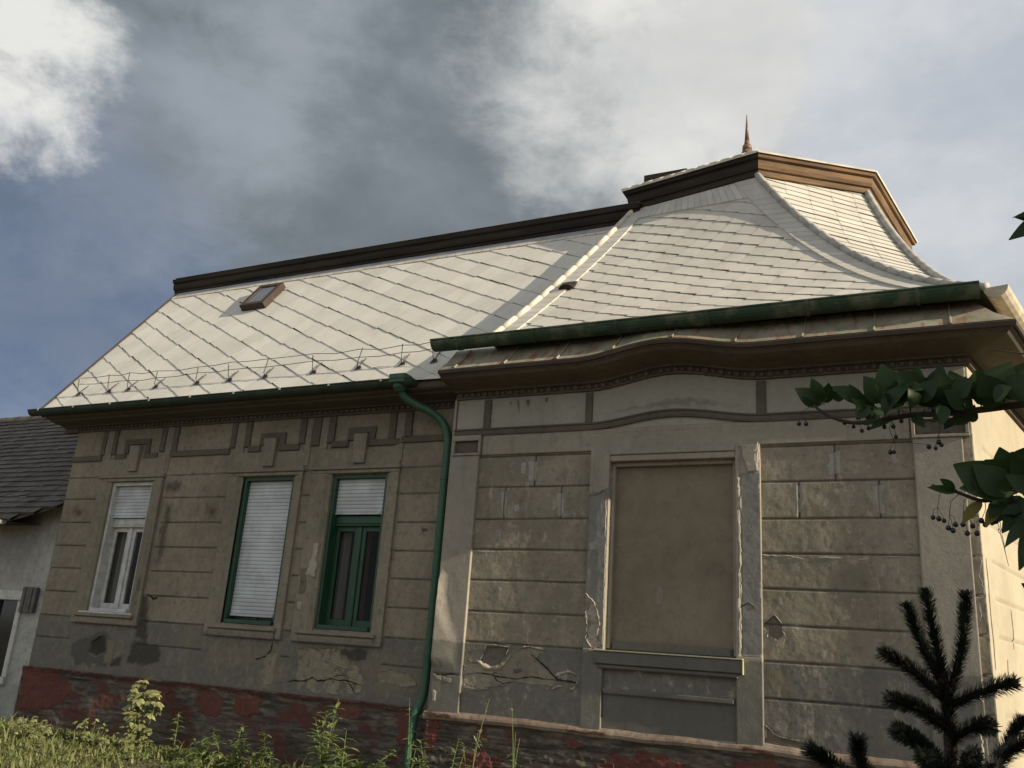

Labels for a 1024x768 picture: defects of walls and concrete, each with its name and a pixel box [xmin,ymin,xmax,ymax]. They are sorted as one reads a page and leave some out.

flaking render [737,435,786,657]
spalling [297,543,320,610]
spalling [585,594,602,648]
peeling [16,668,71,714]
peeling [143,684,170,706]
water stain [26,597,408,710]
crack [283,674,361,692]
spalling [295,647,366,720]
flaking render [432,644,578,701]